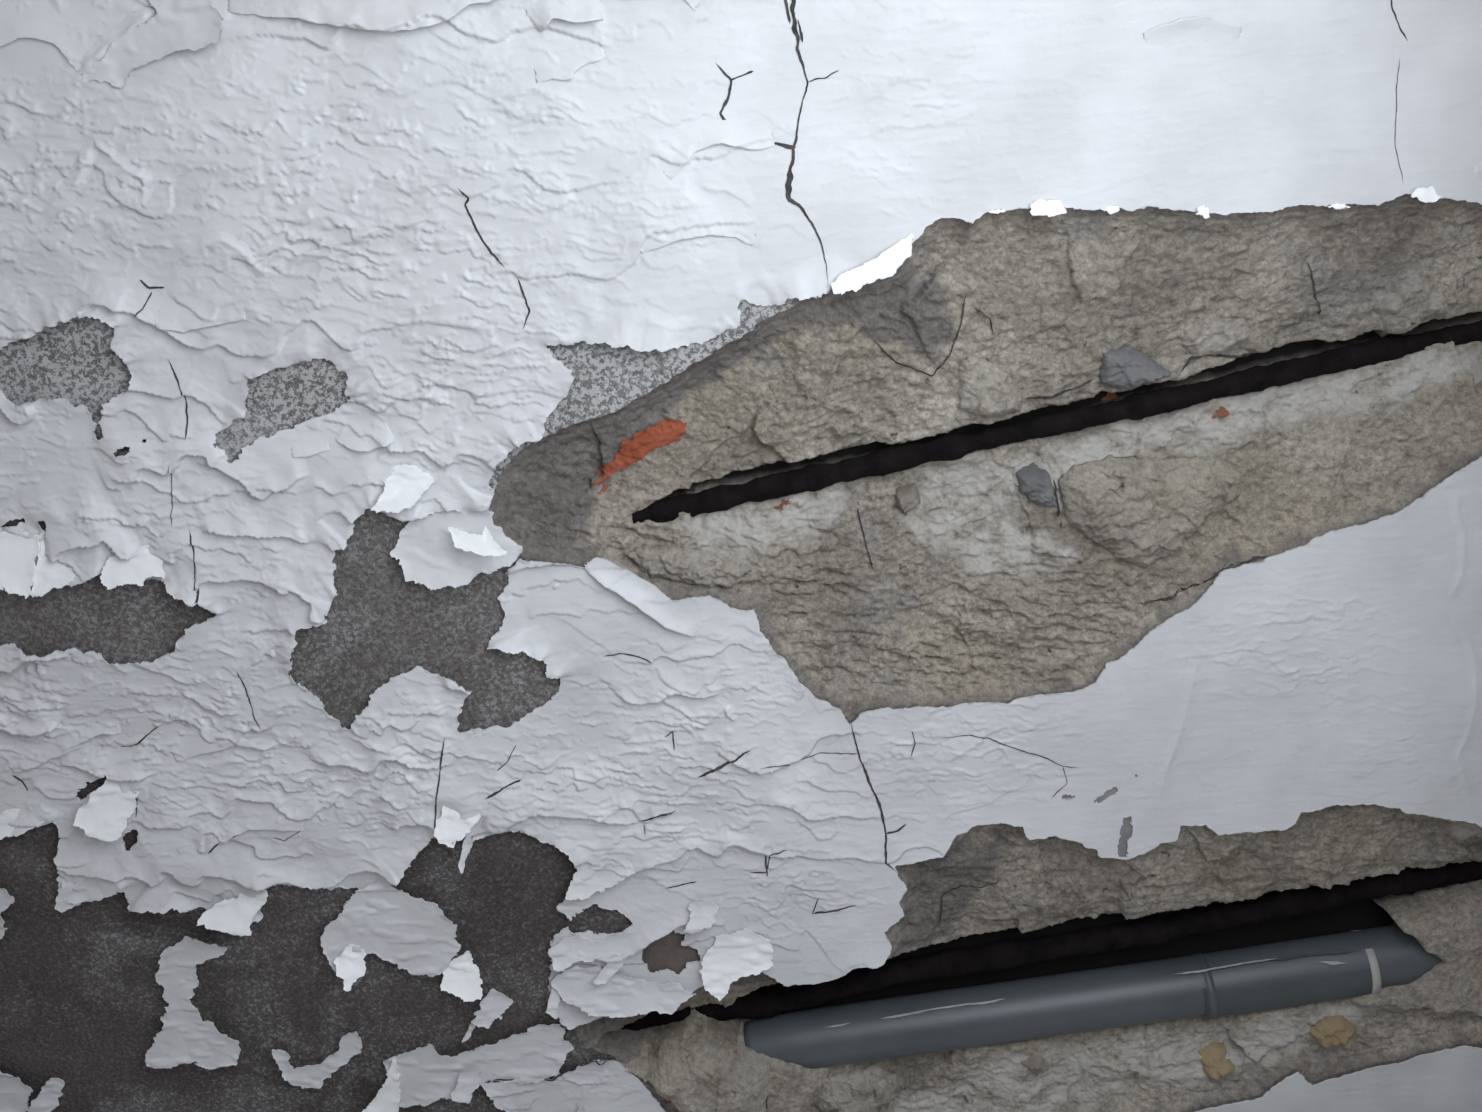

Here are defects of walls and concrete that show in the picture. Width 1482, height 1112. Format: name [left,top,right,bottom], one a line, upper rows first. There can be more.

peeling [226,0,492,32]
crack [718,65,753,120]
crack [774,0,839,279]
crack [1391,0,1408,179]
peeling [0,317,132,440]
peeling [214,358,395,463]
rust [594,419,687,494]
spalling [288,186,1482,732]
peeling [0,518,217,664]
crack [641,810,676,833]
crack [698,724,906,871]
peeling [0,775,1482,1112]